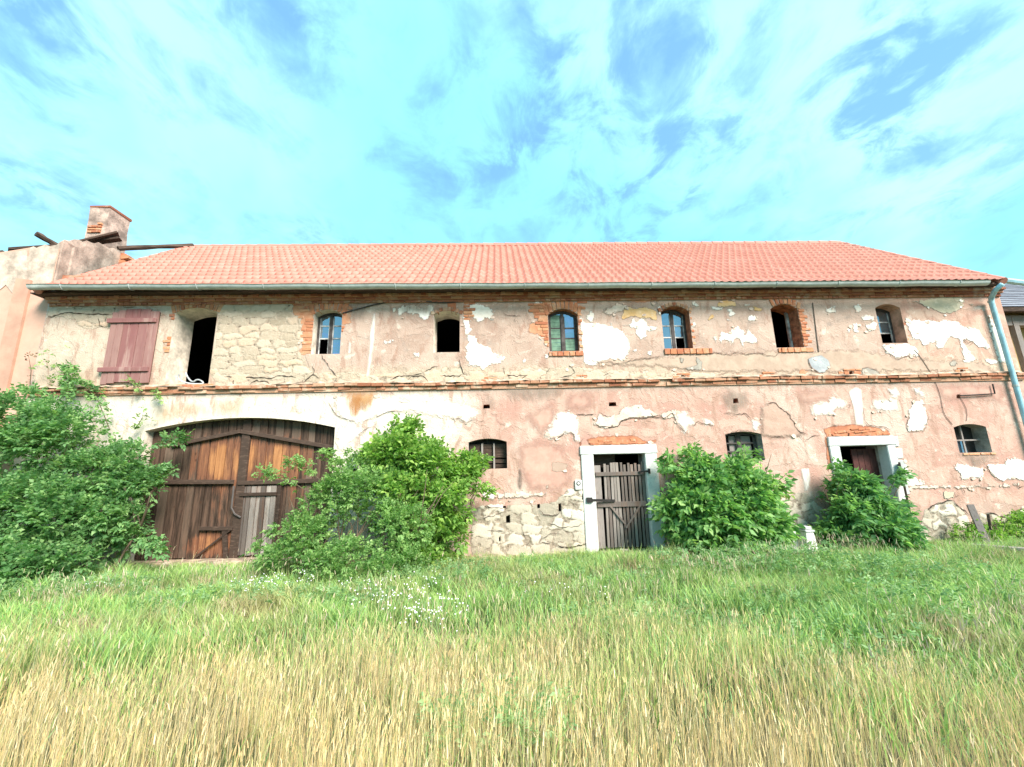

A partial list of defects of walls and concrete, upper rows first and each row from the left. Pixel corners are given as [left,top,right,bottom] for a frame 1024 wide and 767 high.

flaking render [210,297,1006,385]
crack [227,356,464,434]
flaking render [544,404,714,461]
crack [553,402,929,443]
flaking render [811,397,889,471]
flaking render [871,388,928,432]
flaking render [470,485,586,556]
flaking render [903,457,1024,541]